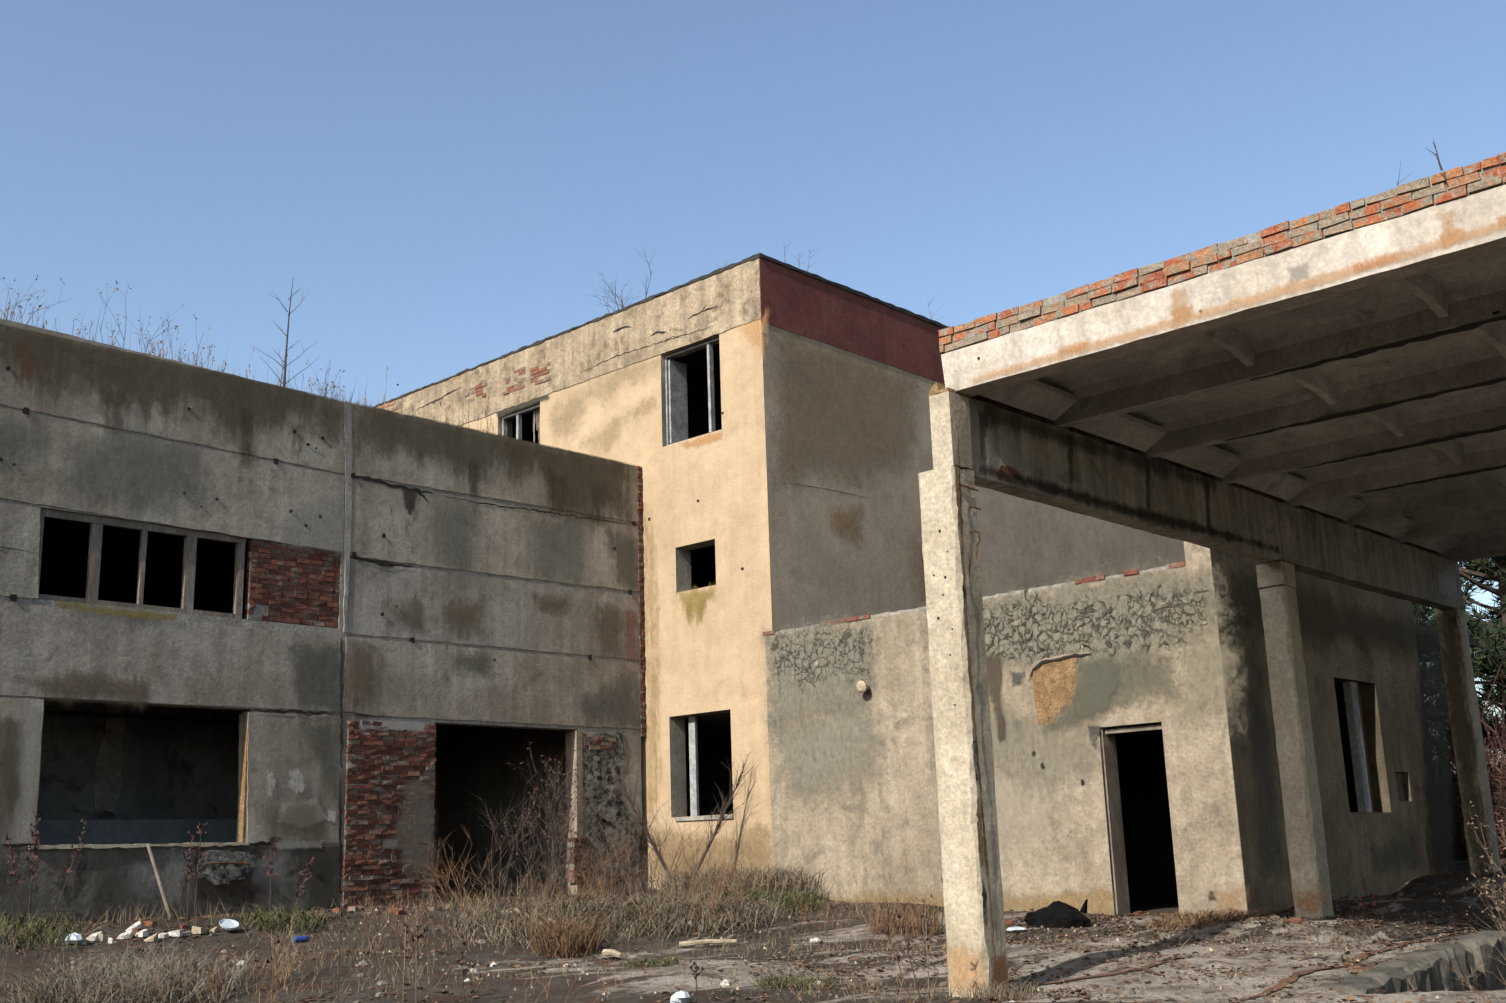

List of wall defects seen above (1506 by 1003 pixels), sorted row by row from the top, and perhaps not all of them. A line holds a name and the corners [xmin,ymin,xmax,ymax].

leakage [0,324,629,585]
crack [355,476,637,526]
leakage [610,535,652,599]
peeling [771,627,872,688]
flaking render [933,430,1207,981]
leakage [979,405,1283,861]
flaking render [566,732,640,882]